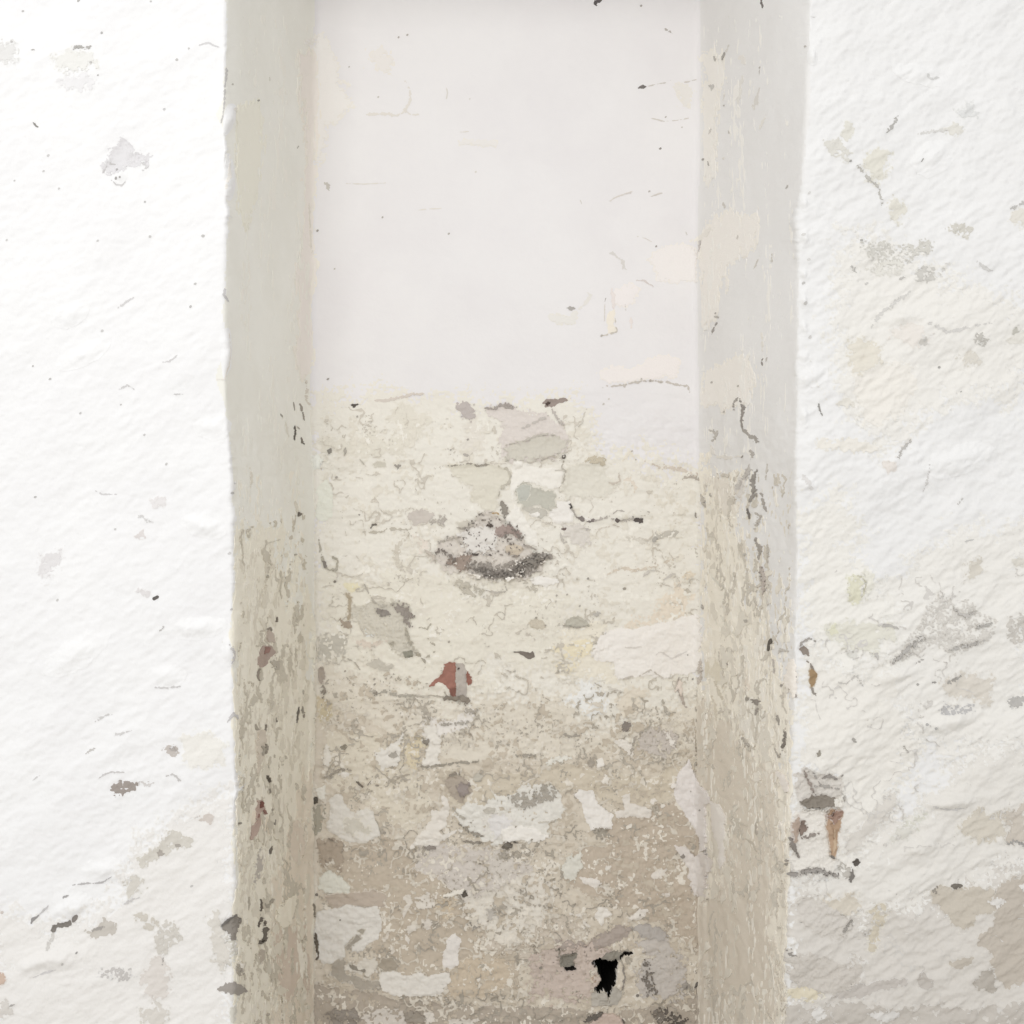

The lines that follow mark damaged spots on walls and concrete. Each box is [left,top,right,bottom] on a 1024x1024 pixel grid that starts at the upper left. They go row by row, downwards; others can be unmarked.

spalling [455,398,571,465]
spalling [407,481,595,598]
spalling [257,617,281,670]
spalling [339,598,419,658]
flaking render [429,662,472,706]
water stain [0,374,1024,1024]
spalling [238,800,274,840]
peeling [262,706,700,1024]
spalling [786,767,844,878]
rust [825,808,844,860]
peeling [783,875,1024,1024]
spalling [217,982,248,996]